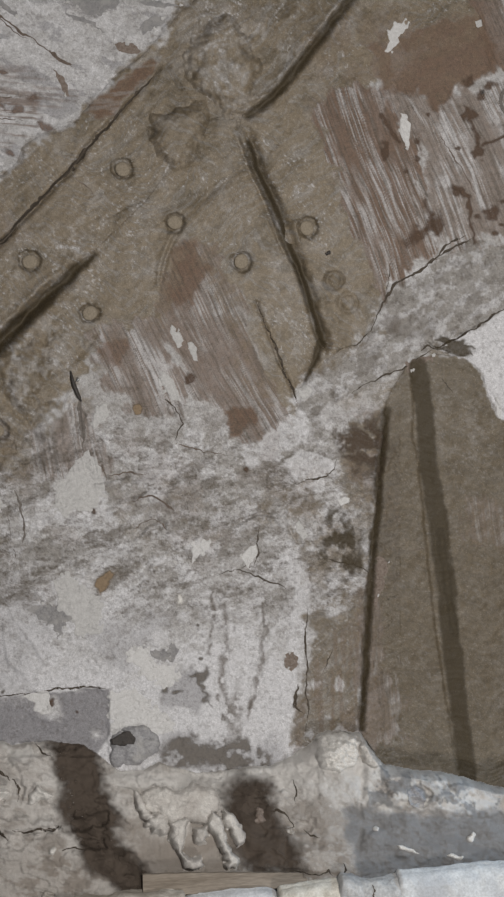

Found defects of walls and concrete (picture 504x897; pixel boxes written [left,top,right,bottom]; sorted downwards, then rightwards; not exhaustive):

crack [0,15,72,67]
peeling [65,0,120,33]
peeling [115,39,141,54]
peeling [385,18,410,53]
peeling [398,113,411,150]
crack [330,236,472,359]
peeling [170,325,198,361]
crack [353,309,504,392]
corrosion [95,571,114,593]
damp [320,408,390,731]
damp [410,359,476,780]
crack [293,609,333,731]